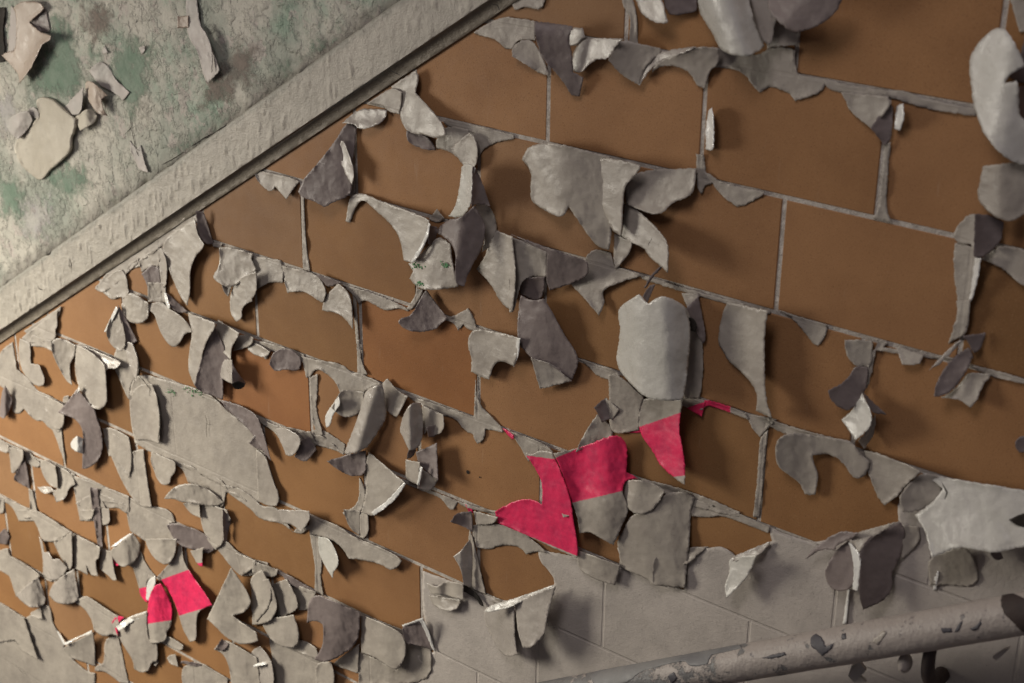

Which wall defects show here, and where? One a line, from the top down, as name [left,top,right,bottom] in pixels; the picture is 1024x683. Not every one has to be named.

flaking render [0,1,51,84]
flaking render [6,46,130,180]
flaking render [177,0,220,83]
peeling [95,69,772,418]
peeling [474,0,1024,449]
peeling [0,284,1024,683]